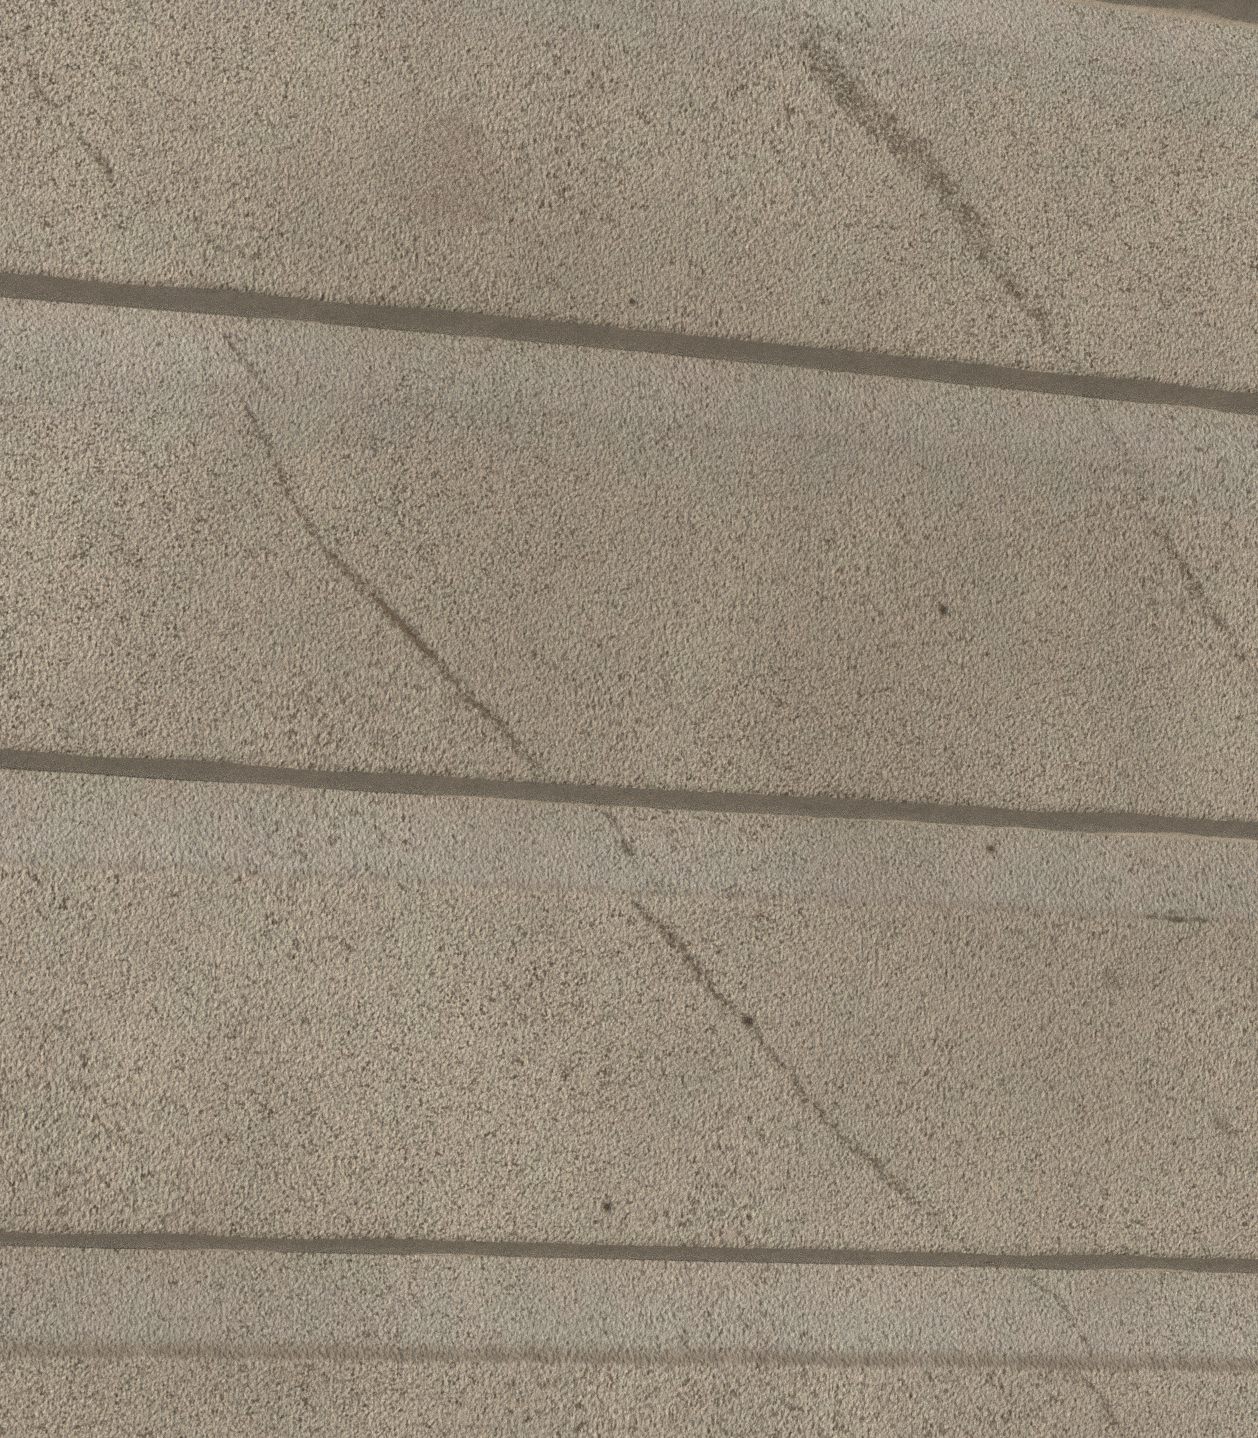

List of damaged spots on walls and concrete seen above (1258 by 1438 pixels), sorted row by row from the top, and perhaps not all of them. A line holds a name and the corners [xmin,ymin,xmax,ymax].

crack [785,12,1061,359]
crack [225,333,540,767]
crack [1084,396,1257,693]
crack [591,804,943,1230]
crack [986,1262,1128,1438]